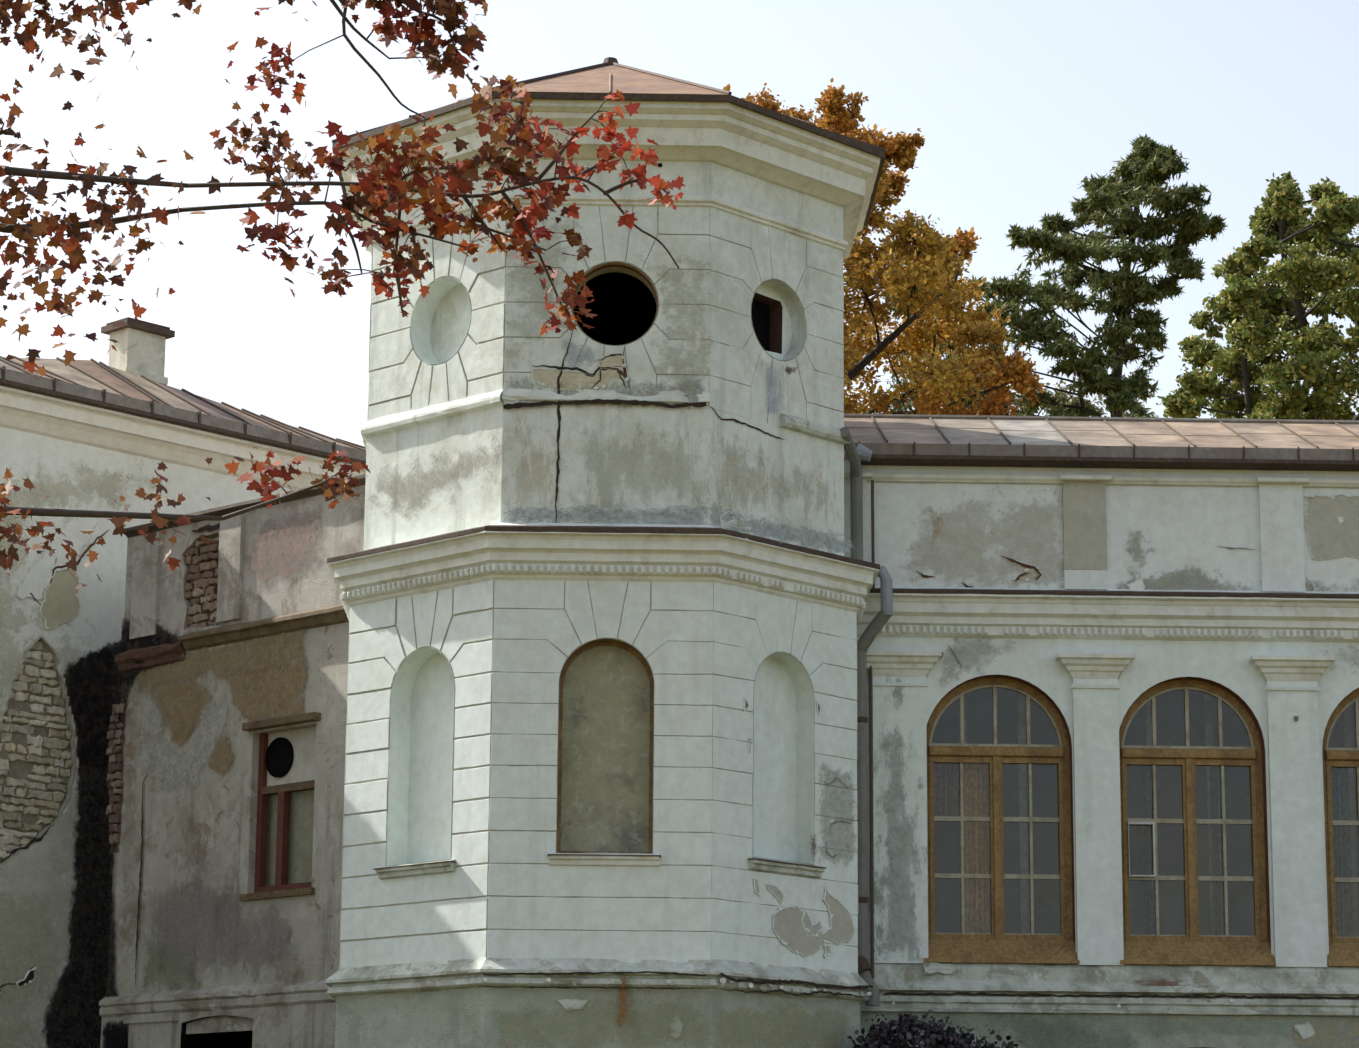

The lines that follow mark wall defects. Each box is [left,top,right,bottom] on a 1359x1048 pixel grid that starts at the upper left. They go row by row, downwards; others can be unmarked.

flaking render [531,352,629,391]
crack [532,331,630,523]
crack [710,406,782,439]
flaking render [184,534,219,629]
crack [1000,555,1042,581]
peeling [1304,494,1359,560]
flaking render [0,568,80,866]
flaking render [106,703,127,853]
water stain [874,728,922,960]
peeling [754,878,854,958]